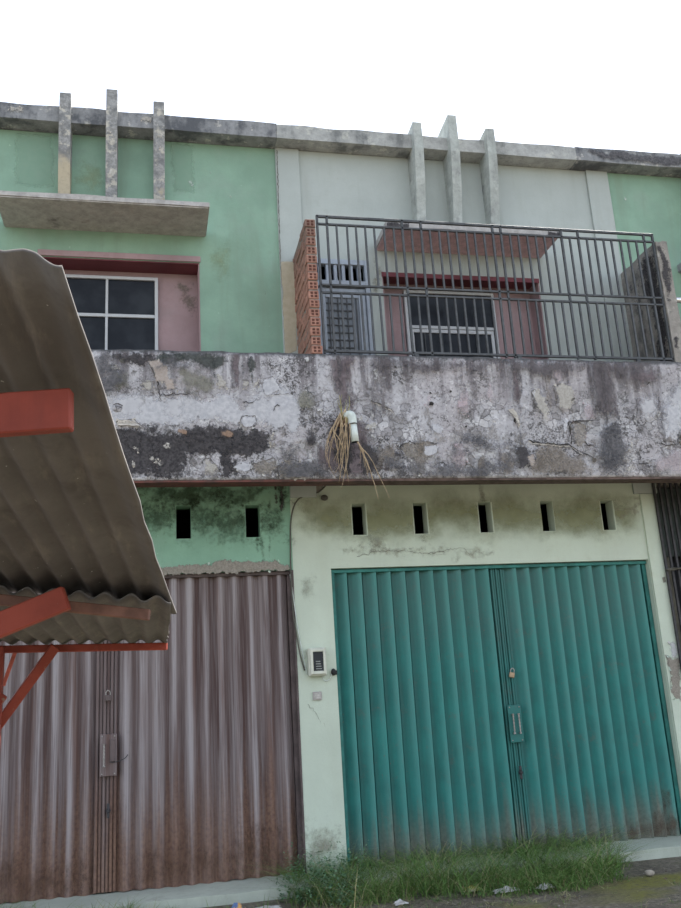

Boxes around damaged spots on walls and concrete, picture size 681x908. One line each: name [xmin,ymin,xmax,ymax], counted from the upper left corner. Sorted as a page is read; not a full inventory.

spalling [116,418,142,429]
peeling [141,359,178,394]
leakage [96,350,313,479]
peeling [239,415,257,429]
leakage [274,356,593,511]
leakage [367,246,681,475]
spalling [532,383,575,432]
peeling [665,638,681,701]